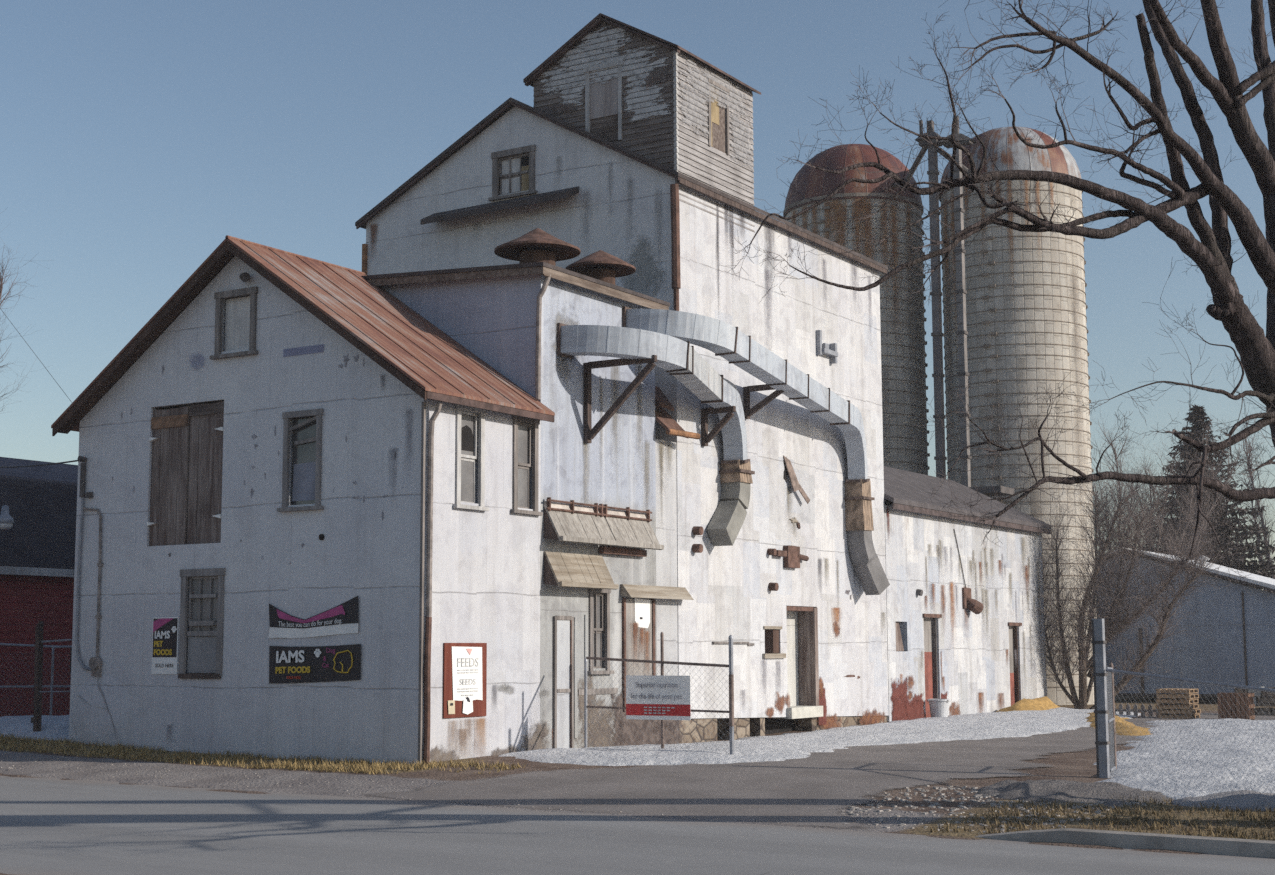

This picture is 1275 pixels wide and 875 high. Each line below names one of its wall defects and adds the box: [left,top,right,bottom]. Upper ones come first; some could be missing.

peeling [540,26,754,171]
corrosion [362,224,376,275]
corrosion [944,180,1053,315]
corrosion [925,541,966,617]
corrosion [959,539,1040,605]
peeling [891,677,926,721]